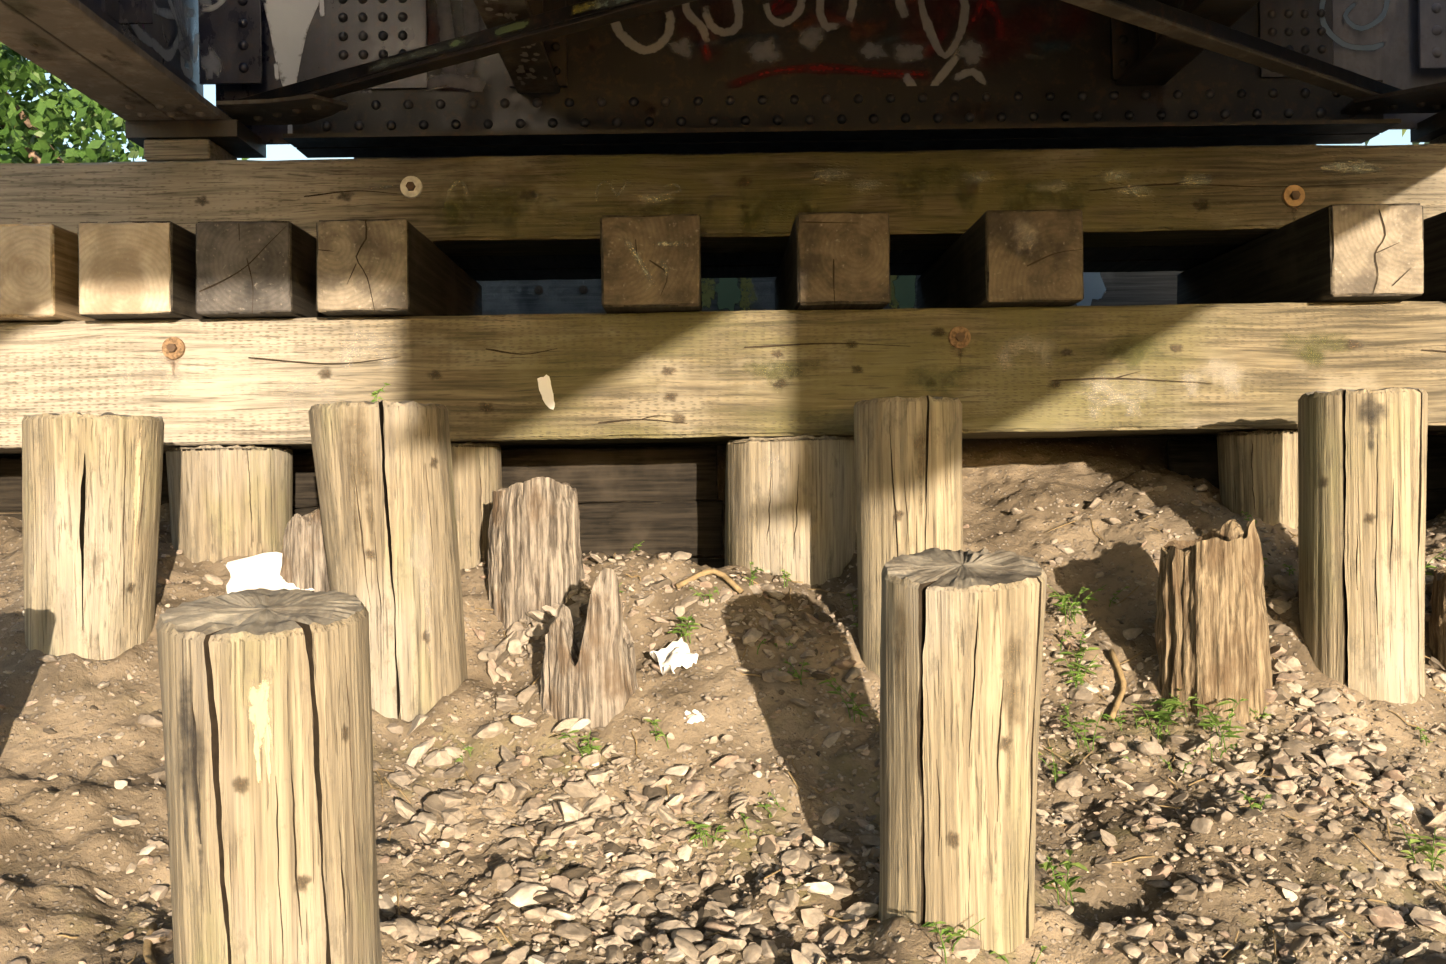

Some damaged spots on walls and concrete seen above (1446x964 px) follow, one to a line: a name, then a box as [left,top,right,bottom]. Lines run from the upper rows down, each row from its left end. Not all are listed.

crack [199,223,286,311]
crack [304,190,397,311]
crack [1089,176,1411,296]
crack [248,356,401,365]
crack [353,400,400,717]
crack [425,464,434,569]
crack [1342,389,1422,685]
crack [890,395,1042,938]
crack [1415,595,1423,695]
crack [192,627,232,964]
crack [275,621,359,964]